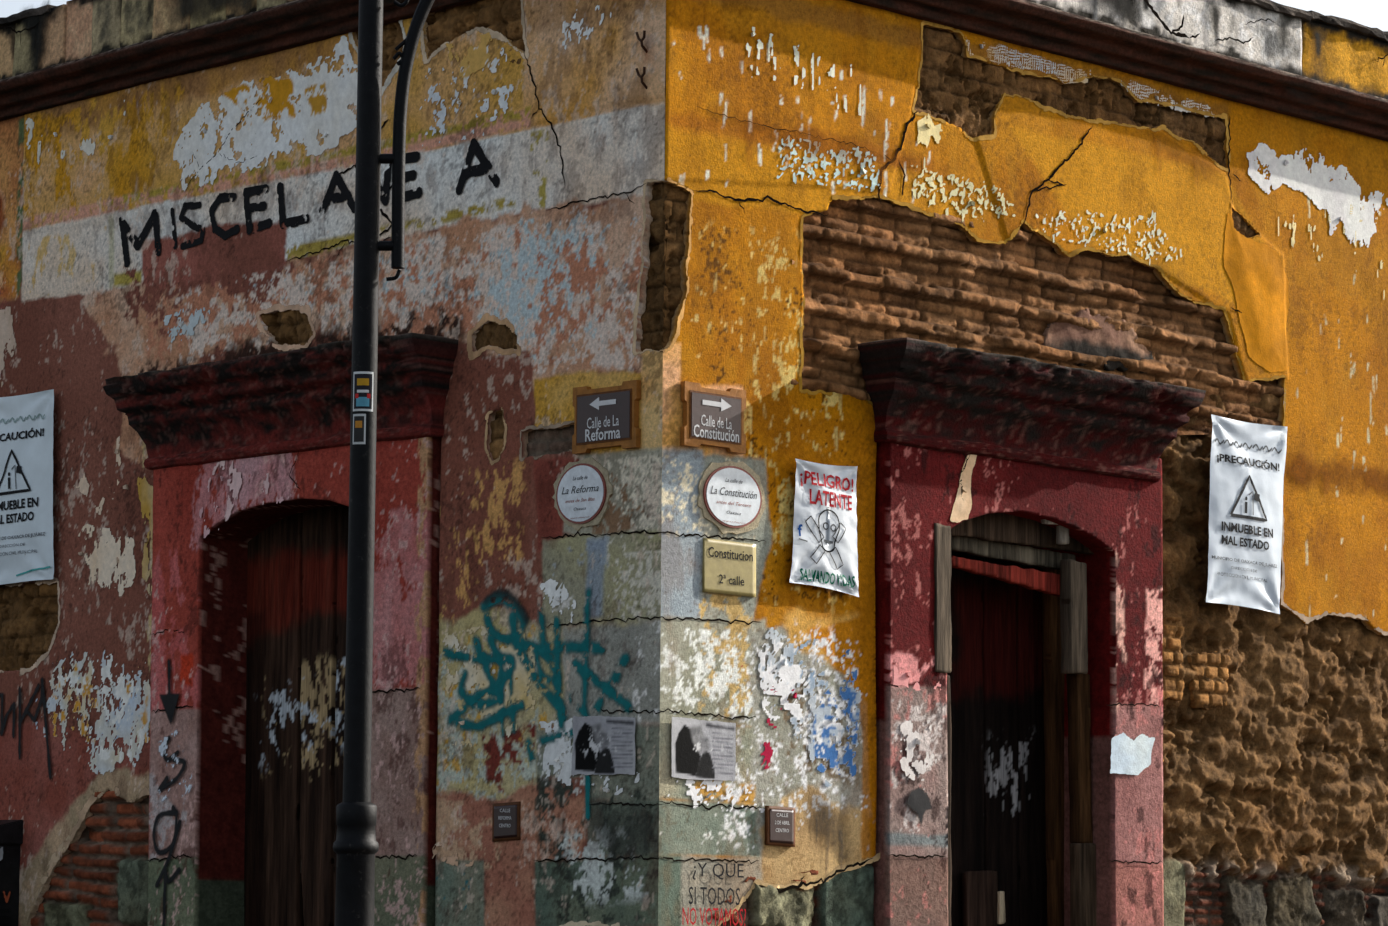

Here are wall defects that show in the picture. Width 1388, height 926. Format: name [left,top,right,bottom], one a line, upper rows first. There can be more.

peeling [0,306,16,387]
peeling [173,31,358,191]
spalling [256,303,316,351]
spalling [467,313,521,360]
crack [524,54,646,210]
spalling [632,170,694,356]
crack [693,189,827,216]
crack [1024,128,1092,223]
peeling [69,436,153,596]
spalling [777,20,1388,926]
spalling [0,577,150,926]
spalling [710,843,880,926]